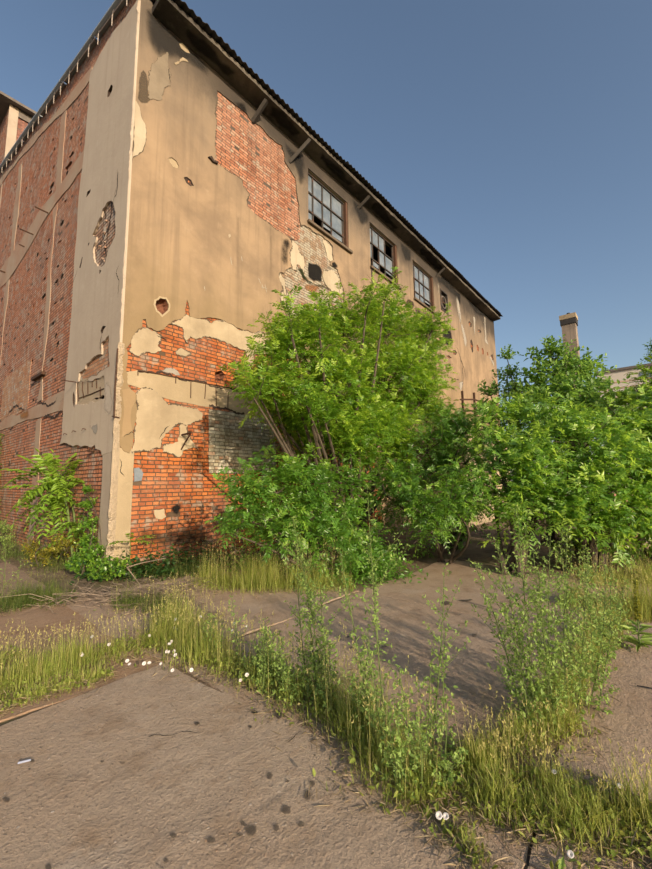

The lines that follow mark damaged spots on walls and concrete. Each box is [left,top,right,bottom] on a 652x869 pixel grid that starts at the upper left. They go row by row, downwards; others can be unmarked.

peeling [132,43,189,161]
flaking render [88,202,116,274]
peeling [208,90,345,318]
spalling [156,299,168,315]
peeling [73,314,292,561]